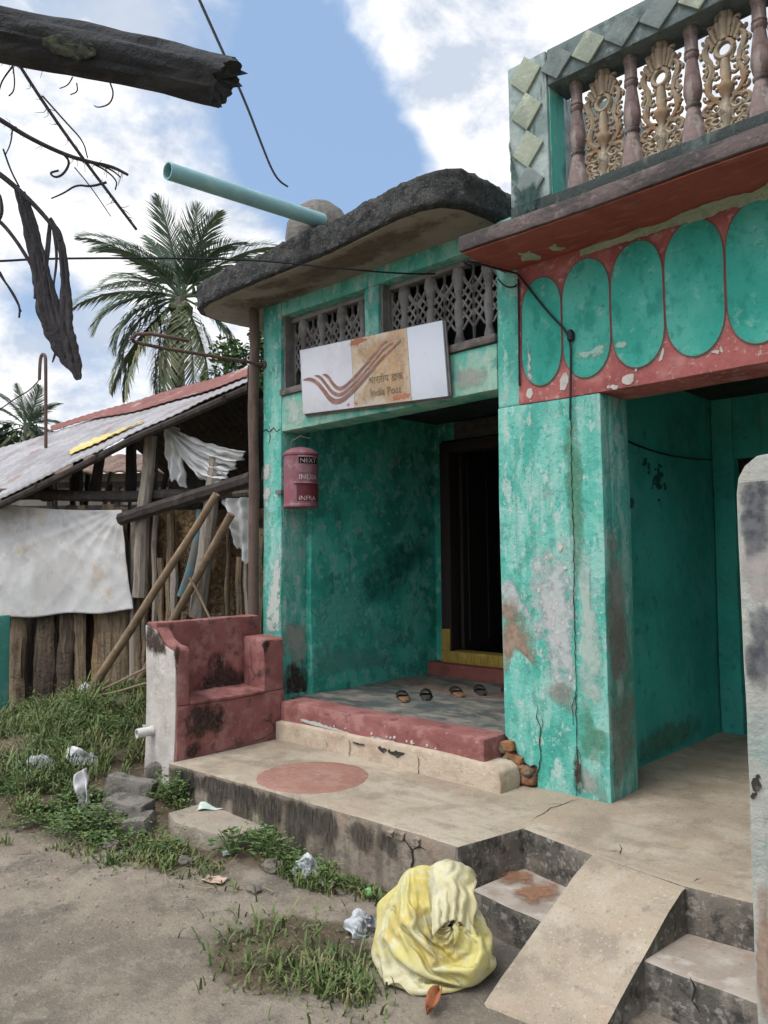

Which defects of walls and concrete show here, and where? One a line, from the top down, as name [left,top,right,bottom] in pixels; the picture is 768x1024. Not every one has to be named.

peeling [580,182,768,256]
peeling [518,244,566,261]
peeling [578,341,626,359]
peeling [560,372,569,391]
peeling [607,368,637,390]
leakage [283,549,423,693]
crack [535,420,581,818]
peeling [501,536,624,700]
leakage [170,769,396,858]
crack [404,839,426,868]
corrosion [500,870,558,904]